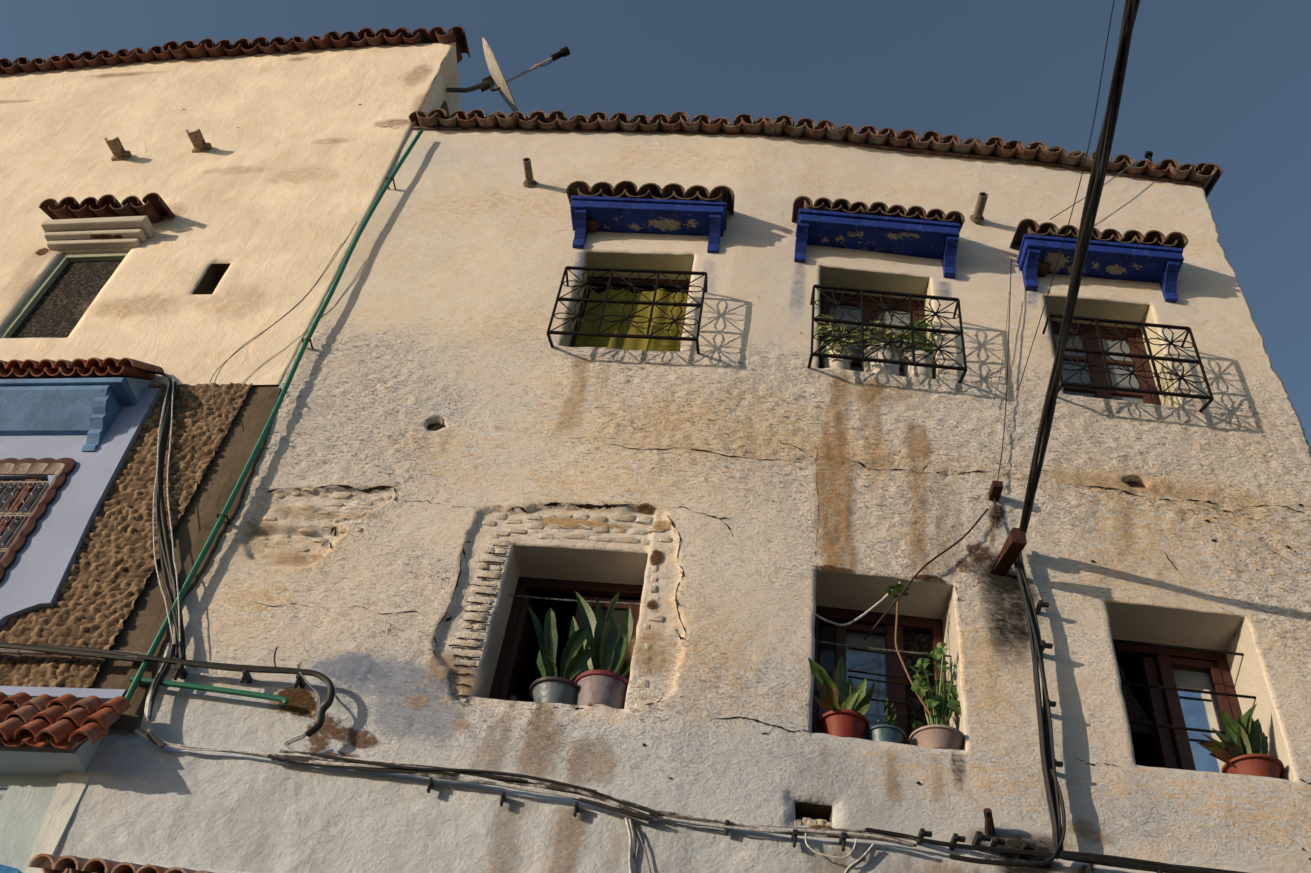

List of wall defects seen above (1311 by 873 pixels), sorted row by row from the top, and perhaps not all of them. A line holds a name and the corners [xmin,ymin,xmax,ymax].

peeling [586,216,697,232]
peeling [821,231,919,252]
peeling [1037,251,1143,277]
corrosion [816,376,855,572]
crack [1077,484,1310,516]
spalling [259,485,397,553]
corrosion [910,567,944,582]
spalling [434,502,686,707]
leakage [982,572,1035,652]